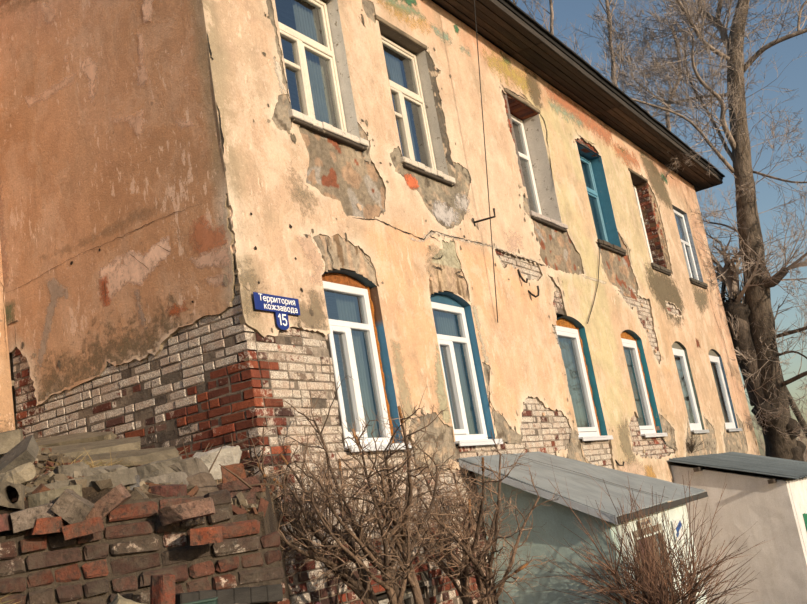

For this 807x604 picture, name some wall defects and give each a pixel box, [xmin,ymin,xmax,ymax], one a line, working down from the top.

flaking render [262,0,473,302]
flaking render [499,79,515,143]
crack [1,202,204,359]
crack [352,217,547,296]
flaking render [494,169,583,346]
flaking render [596,234,664,363]
flaking render [647,184,672,285]
flaking render [12,269,613,604]
flaking render [629,409,748,459]